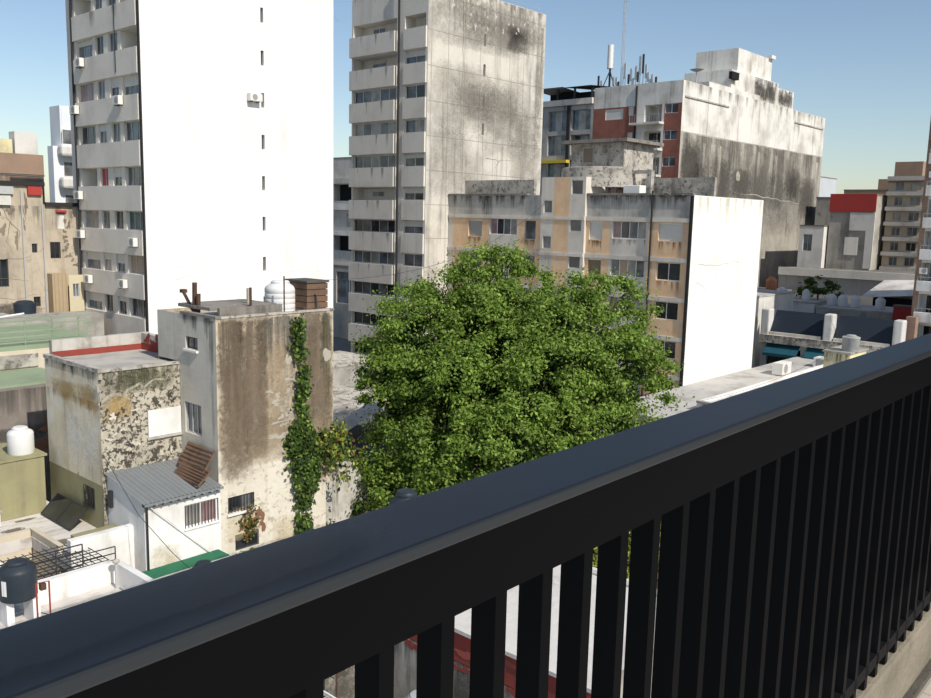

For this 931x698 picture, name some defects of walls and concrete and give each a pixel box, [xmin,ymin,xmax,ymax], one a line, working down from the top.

water stain [489,5,528,51]
water stain [682,133,819,215]
flaking render [0,193,28,251]
flaking render [62,211,78,266]
water stain [220,316,293,476]
water stain [300,312,332,439]
flaking render [102,401,177,472]
water stain [324,665,355,698]
water stain [453,662,470,698]
peeling [454,649,470,674]